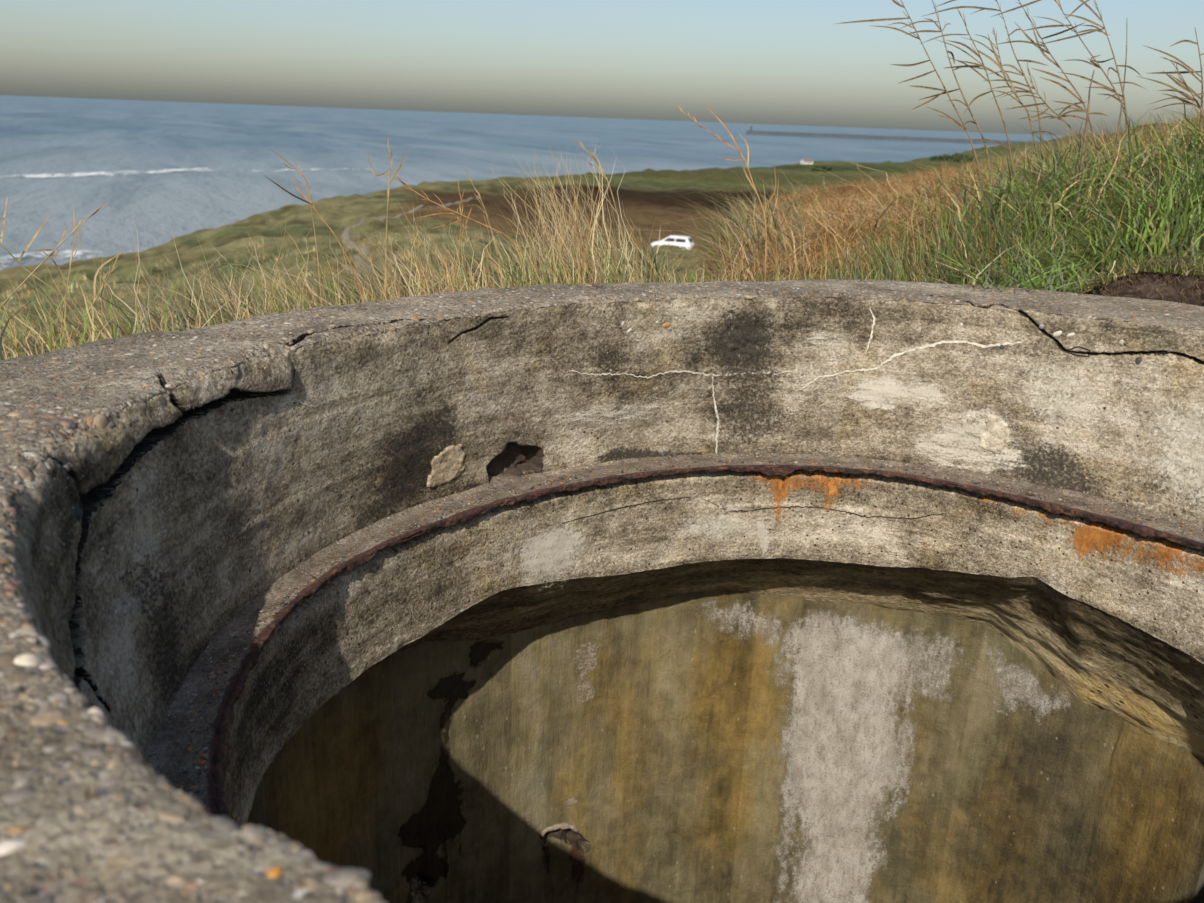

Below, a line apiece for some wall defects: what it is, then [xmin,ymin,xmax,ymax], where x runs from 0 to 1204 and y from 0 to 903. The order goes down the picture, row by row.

crack [51,318,424,713]
spalling [0,280,1204,903]
leakage [703,305,793,448]
corrosion [752,470,872,520]
crack [569,295,1204,453]
corrosion [1013,502,1204,577]
leakage [398,640,504,902]
leakage [703,602,963,903]